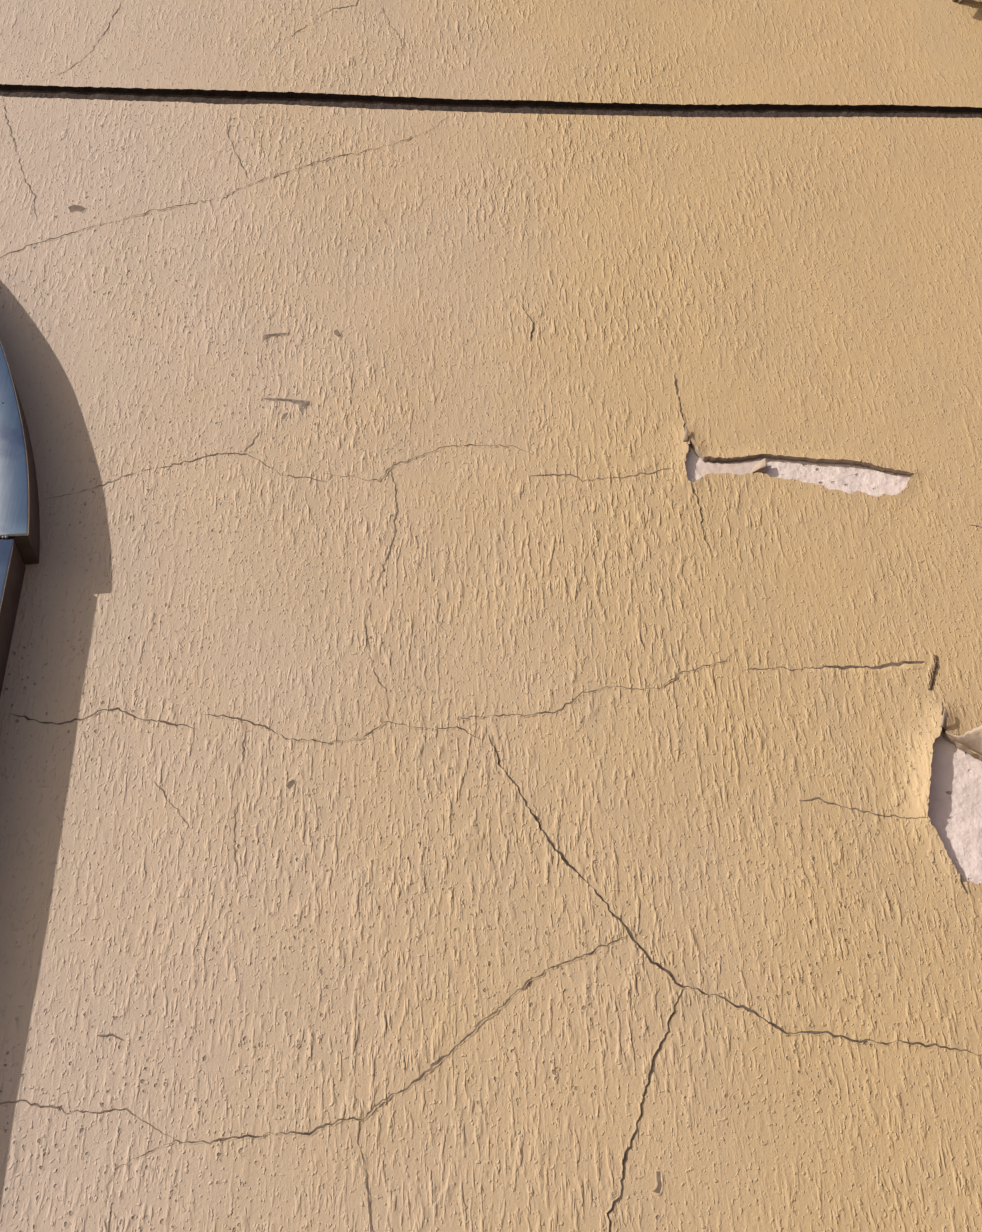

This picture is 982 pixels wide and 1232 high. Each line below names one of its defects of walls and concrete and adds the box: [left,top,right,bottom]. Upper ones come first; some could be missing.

crack [0,97,449,259]
peeling [683,426,911,497]
crack [0,375,982,1232]
peeling [927,701,982,894]